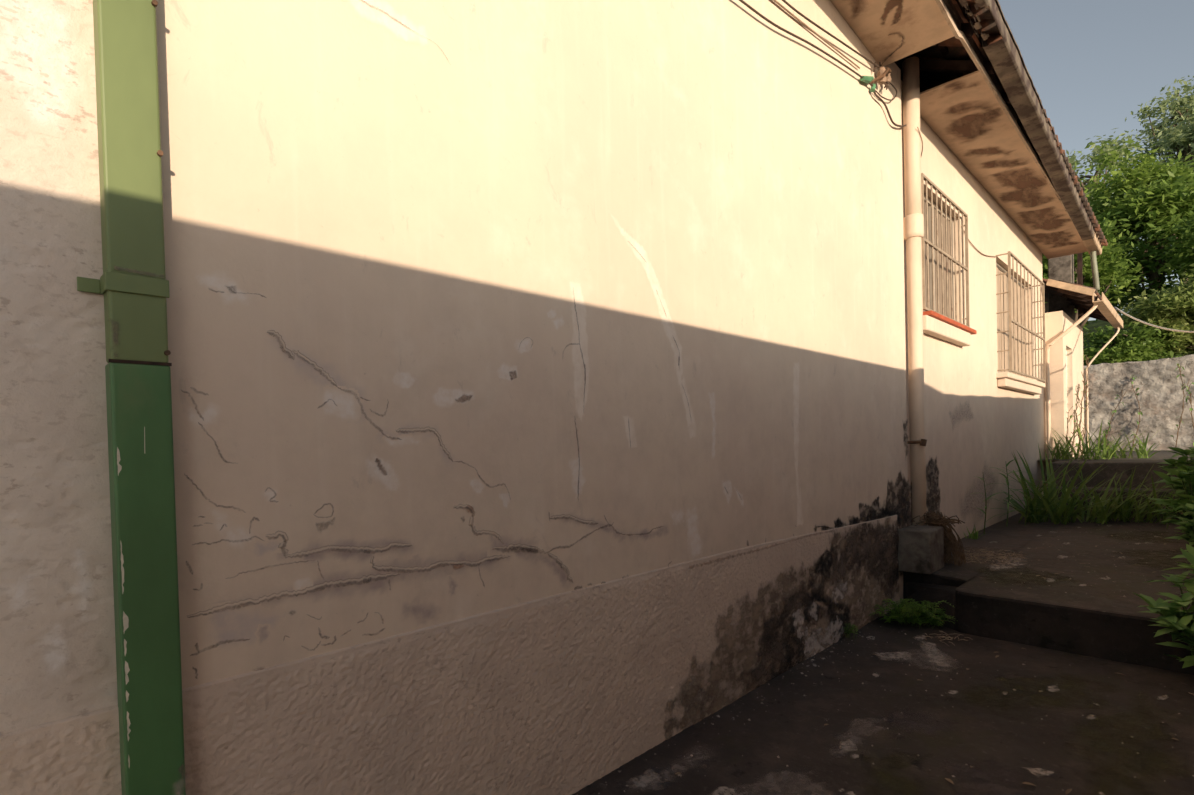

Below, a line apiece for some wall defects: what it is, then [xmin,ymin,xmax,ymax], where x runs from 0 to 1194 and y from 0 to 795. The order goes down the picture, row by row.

crack [342,0,430,48]
water stain [881,0,903,35]
water stain [948,104,1078,247]
crack [182,280,671,671]
water stain [926,458,942,518]
water stain [664,361,913,740]
water stain [875,642,957,671]